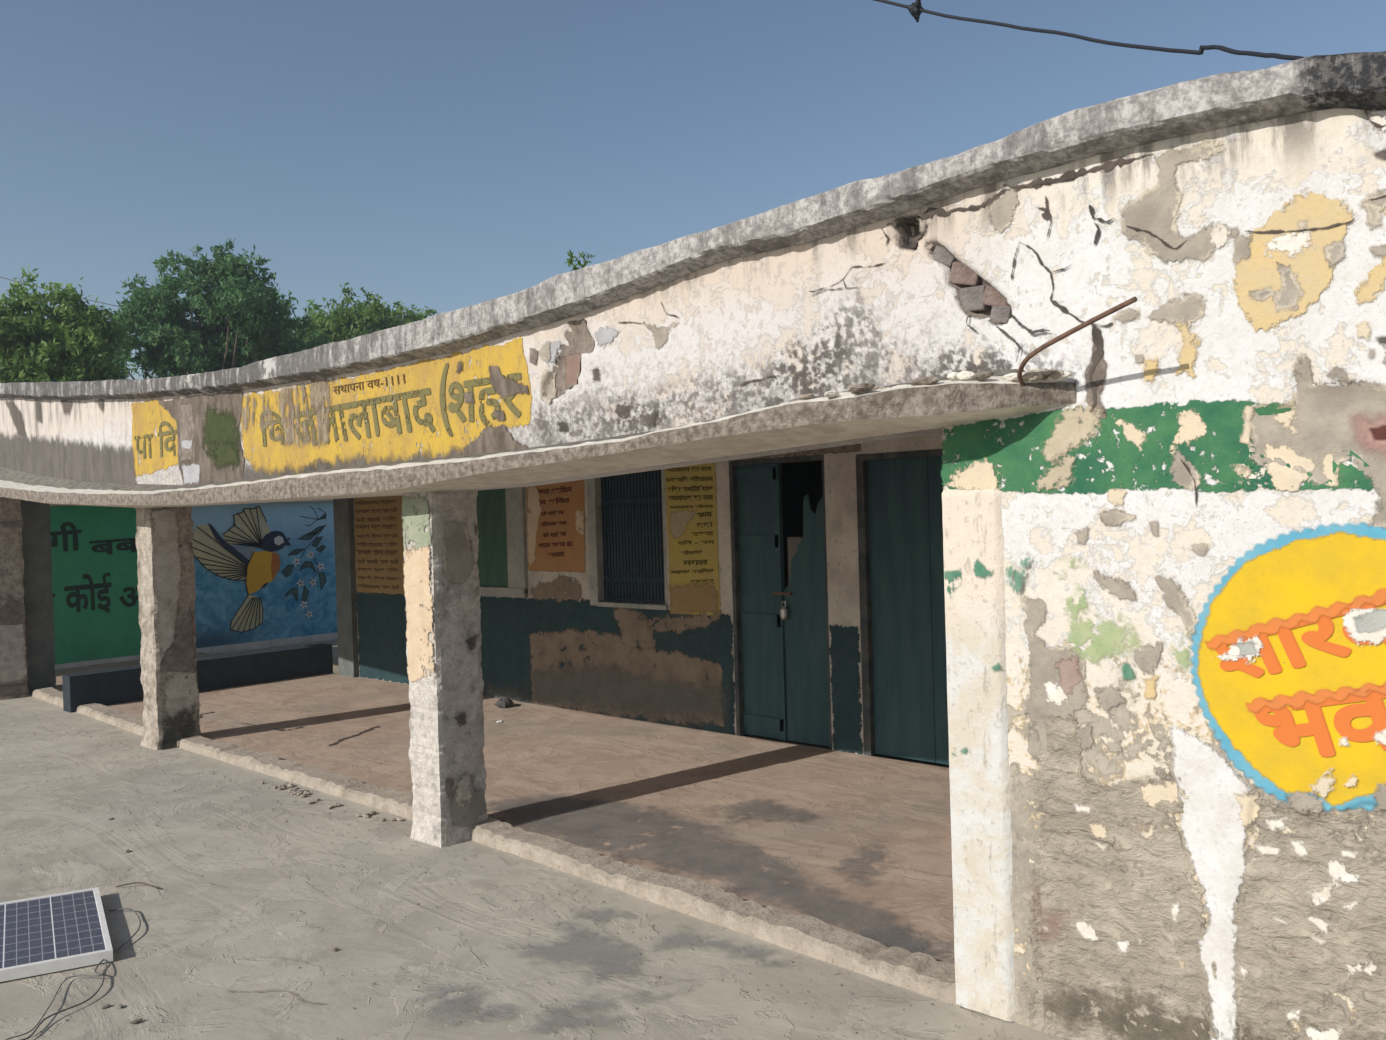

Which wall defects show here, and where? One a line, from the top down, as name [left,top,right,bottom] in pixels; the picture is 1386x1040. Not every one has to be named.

peeling [159,319,679,485]
damp [615,404,658,427]
crack [741,375,779,386]
crack [810,154,1152,420]
spalling [895,214,1207,386]
peeling [1169,409,1207,503]
peeling [1121,138,1386,363]
spalling [1234,353,1386,529]
crack [1359,188,1386,211]
crack [1365,110,1386,131]
peeling [529,608,726,727]
peeling [1020,595,1386,1040]